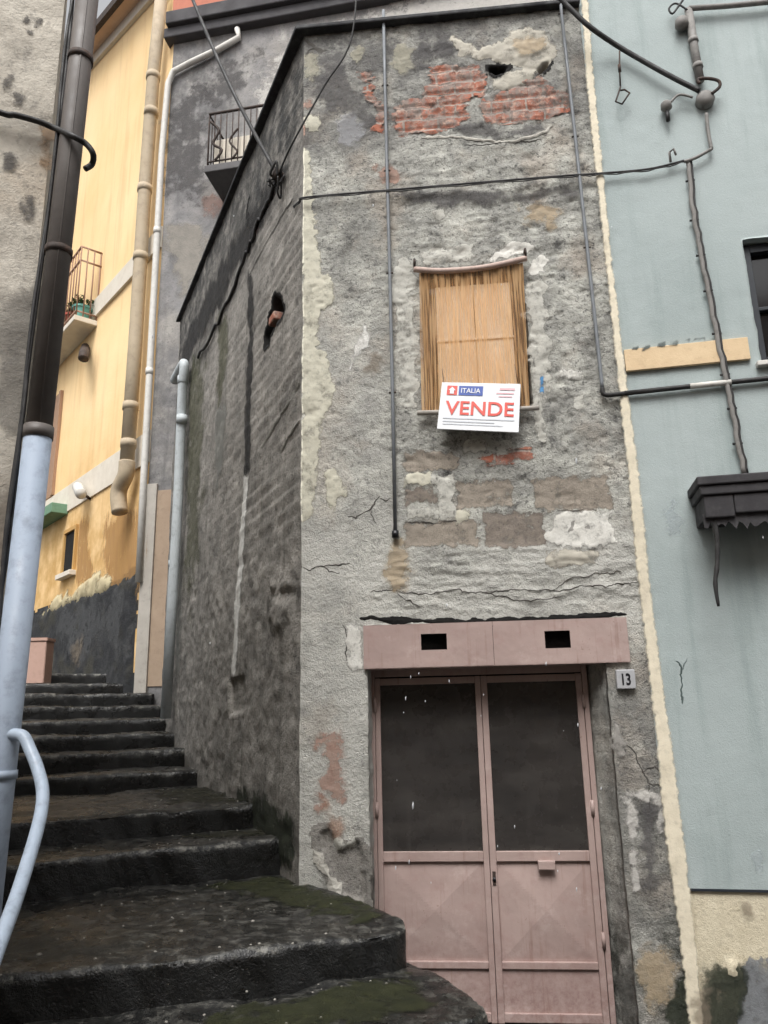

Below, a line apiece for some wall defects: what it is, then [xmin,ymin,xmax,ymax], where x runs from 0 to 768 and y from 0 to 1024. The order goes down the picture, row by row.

spalling [357,27,570,137]
peeling [301,148,347,522]
peeling [389,241,618,569]
crack [348,496,390,525]
crack [303,563,349,573]
crack [343,570,639,667]
crack [677,660,687,704]
crack [627,745,660,804]
spalling [309,822,373,907]
leakage [622,790,665,891]